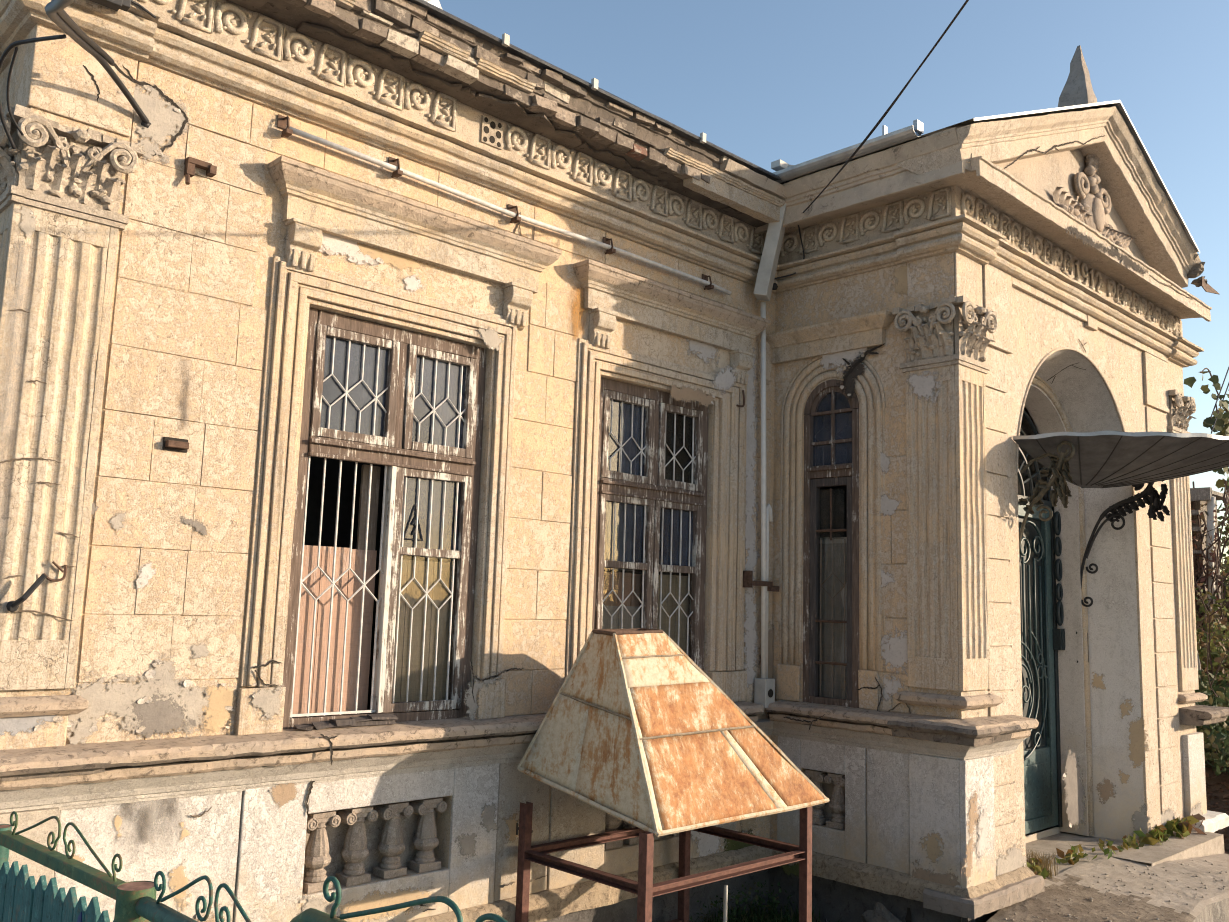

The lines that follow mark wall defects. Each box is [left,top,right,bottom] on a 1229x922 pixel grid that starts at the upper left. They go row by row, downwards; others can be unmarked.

peeling [113,78,192,164]
flaking render [282,0,710,184]
crack [1004,135,1105,169]
peeling [319,232,428,292]
peeling [671,339,760,688]
peeling [0,643,286,745]
crack [470,661,523,703]
peeling [1062,699,1149,828]